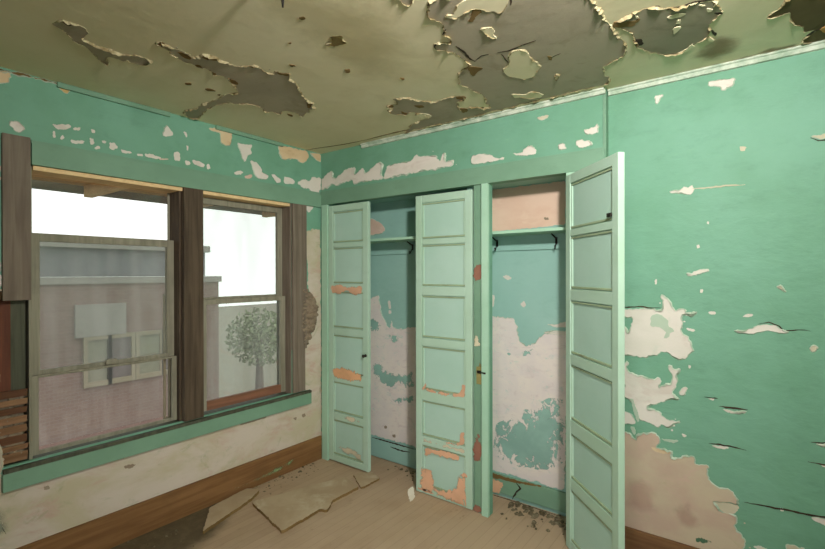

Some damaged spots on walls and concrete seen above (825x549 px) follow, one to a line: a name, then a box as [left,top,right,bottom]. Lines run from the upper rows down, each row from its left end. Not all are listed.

peeling [767,0,825,44]
peeling [386,0,723,134]
peeling [209,128,457,192]
peeling [492,181,566,231]
peeling [0,229,322,549]
peeling [333,296,465,461]
peeling [492,295,566,494]
peeling [625,294,767,549]
crack [707,397,747,415]
crack [710,442,744,450]
crack [494,483,556,515]
crack [745,502,825,526]